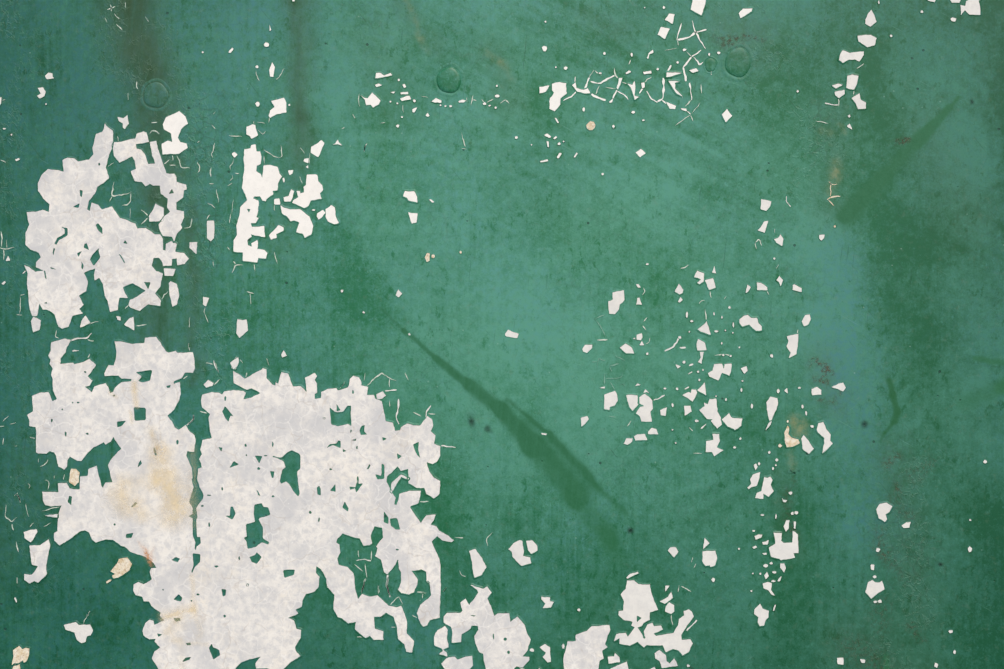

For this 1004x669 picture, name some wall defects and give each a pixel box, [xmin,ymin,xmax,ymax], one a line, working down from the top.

peeling [657,5,676,40]
peeling [689,0,708,17]
peeling [738,6,754,19]
peeling [950,0,982,22]
peeling [255,97,291,123]
peeling [352,71,467,128]
peeling [720,108,733,124]
peeling [599,264,847,457]
peeling [22,110,697,669]